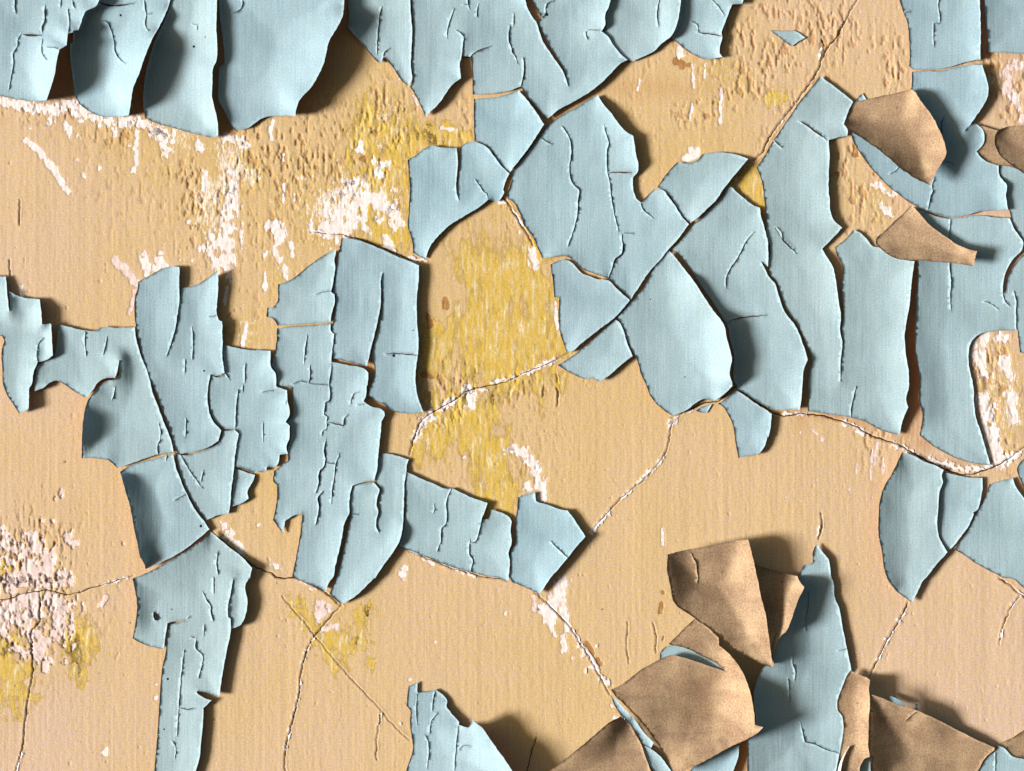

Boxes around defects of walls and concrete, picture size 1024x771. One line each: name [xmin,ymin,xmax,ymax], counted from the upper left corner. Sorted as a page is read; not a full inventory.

peeling [0,0,344,174]
peeling [348,0,1024,472]
leakage [0,555,23,578]
leakage [0,625,43,722]
crack [0,575,134,771]
leakage [51,614,100,689]
peeling [0,154,585,771]
crack [172,532,436,770]
crack [409,352,569,455]
peeling [690,544,851,771]
crack [588,387,1024,536]
peeling [870,441,1024,602]